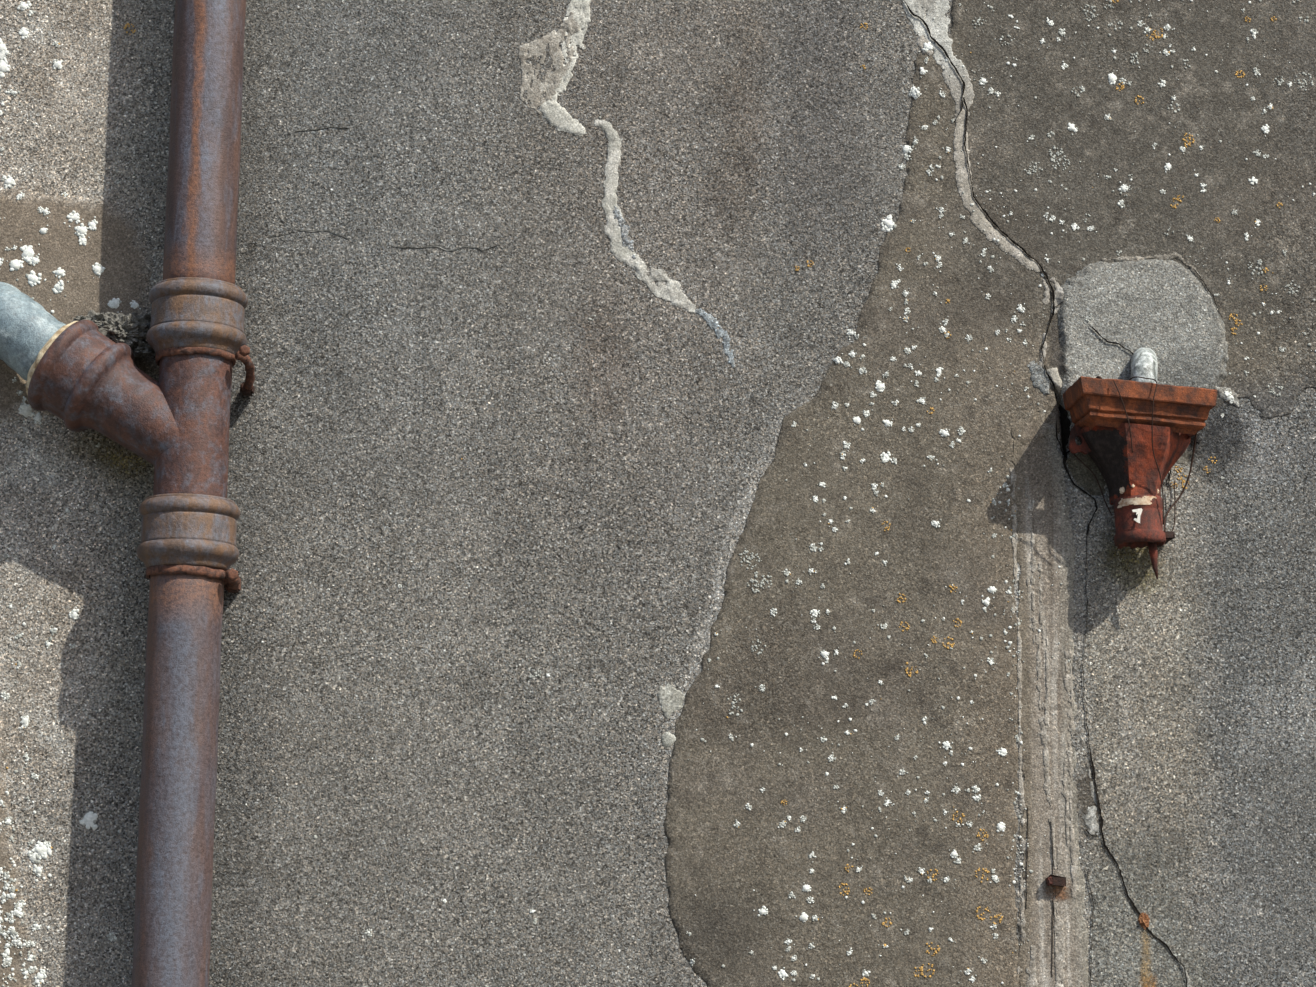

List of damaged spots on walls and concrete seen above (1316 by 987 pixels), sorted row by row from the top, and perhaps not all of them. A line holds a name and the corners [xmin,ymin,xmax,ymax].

crack [518,0,735,368]
spalling [1027,361,1062,395]
crack [902,0,1187,987]
spalling [657,683,685,747]
spalling [1082,769,1101,837]